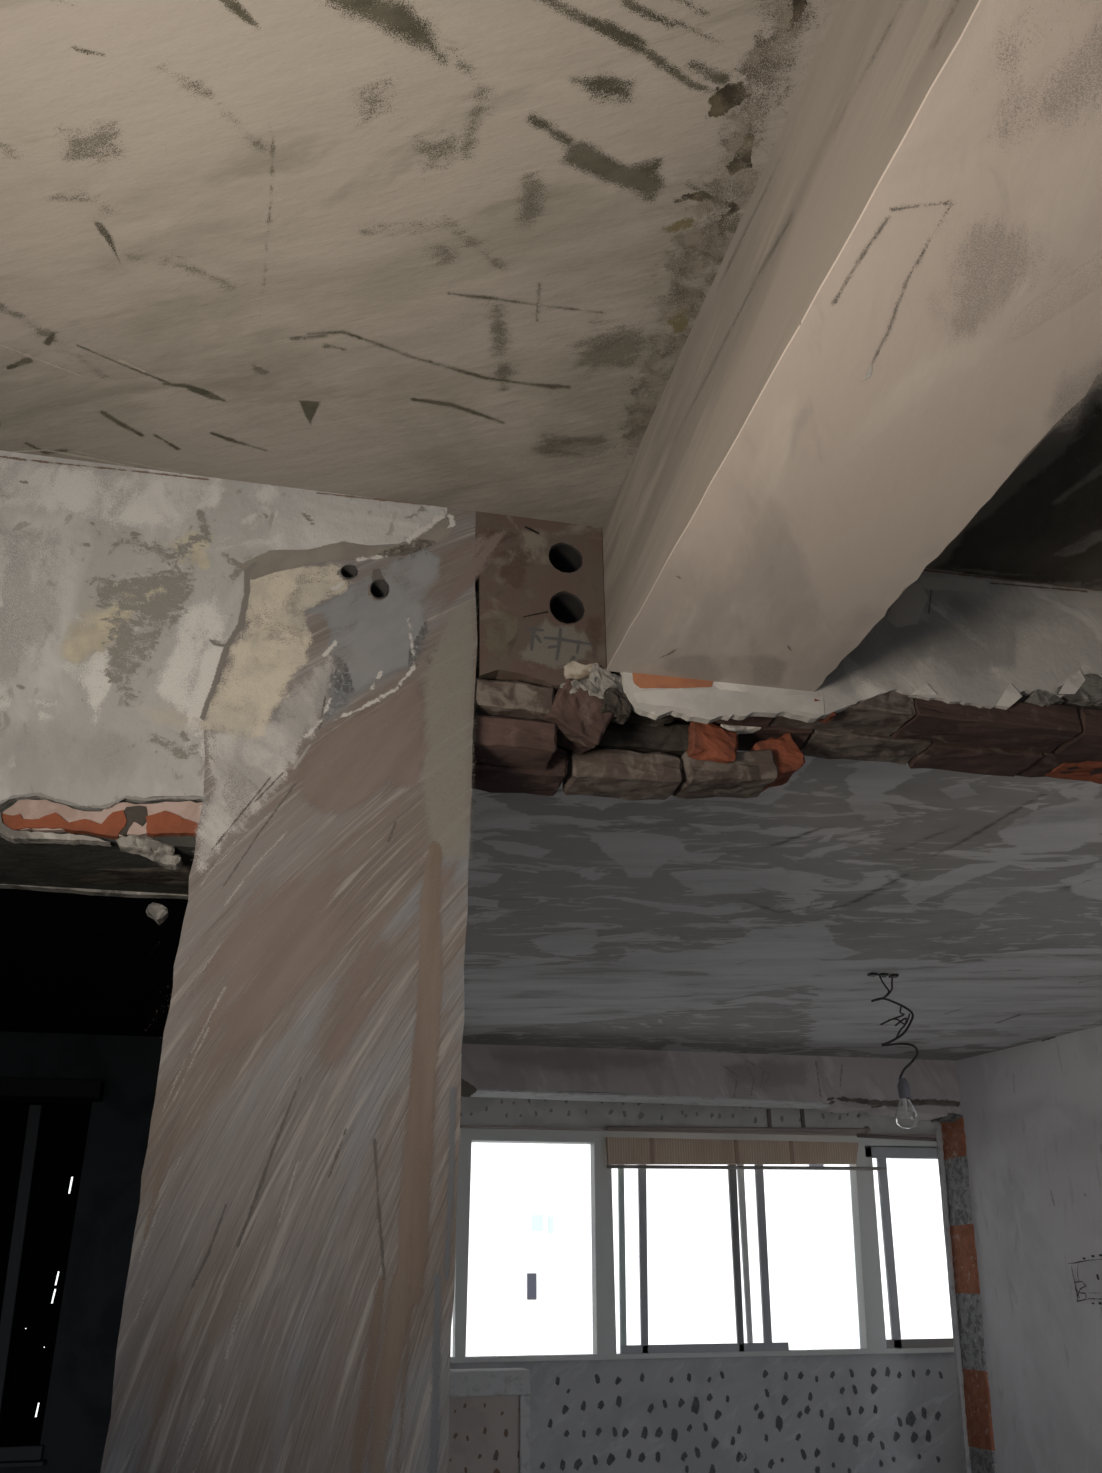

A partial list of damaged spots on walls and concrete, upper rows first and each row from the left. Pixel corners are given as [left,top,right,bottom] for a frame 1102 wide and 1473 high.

peeling [887,583,928,628]
spalling [471,646,1102,800]
spalling [0,792,206,870]
spalling [146,902,168,925]